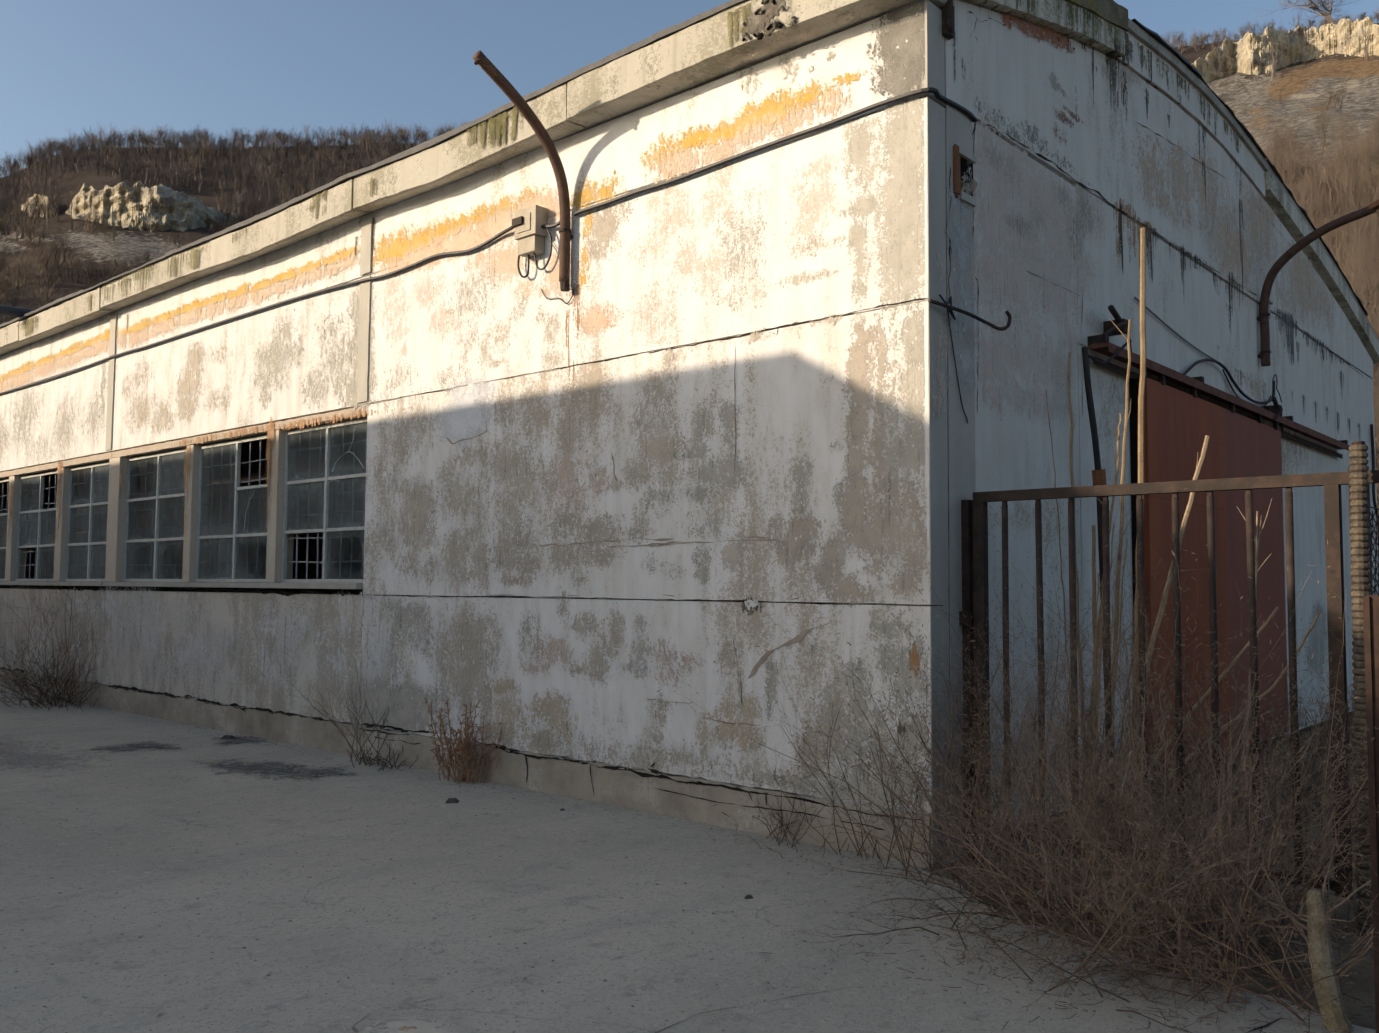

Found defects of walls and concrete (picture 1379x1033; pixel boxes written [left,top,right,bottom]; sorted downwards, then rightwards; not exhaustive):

spalling [1000,12,1075,55]
leakage [467,106,523,148]
peeling [1049,72,1083,143]
leakage [1058,0,1244,328]
leakage [1274,307,1345,386]
peeling [0,0,977,838]
crack [109,685,323,721]
crack [360,723,438,749]
crack [469,739,921,831]